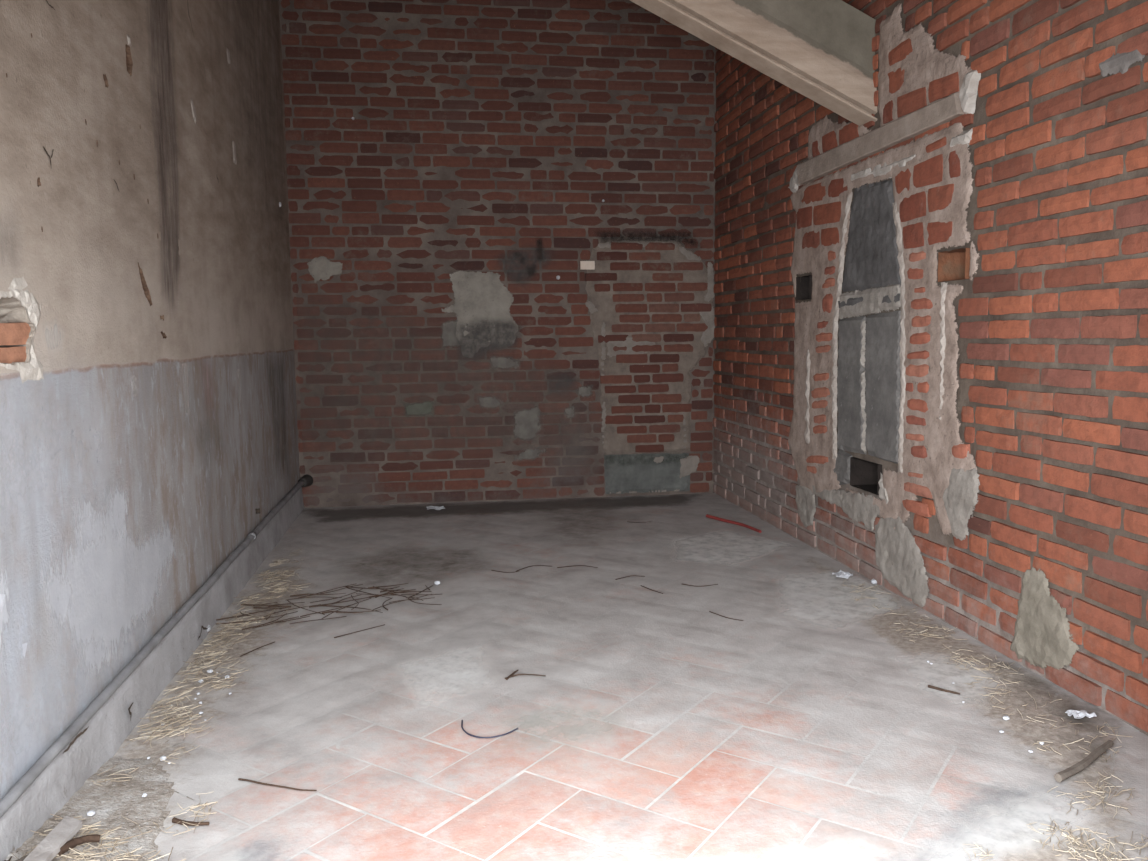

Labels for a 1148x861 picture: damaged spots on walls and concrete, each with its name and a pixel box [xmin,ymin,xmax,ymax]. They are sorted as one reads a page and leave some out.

damp [150,0,179,296]
flaking render [0,323,31,364]